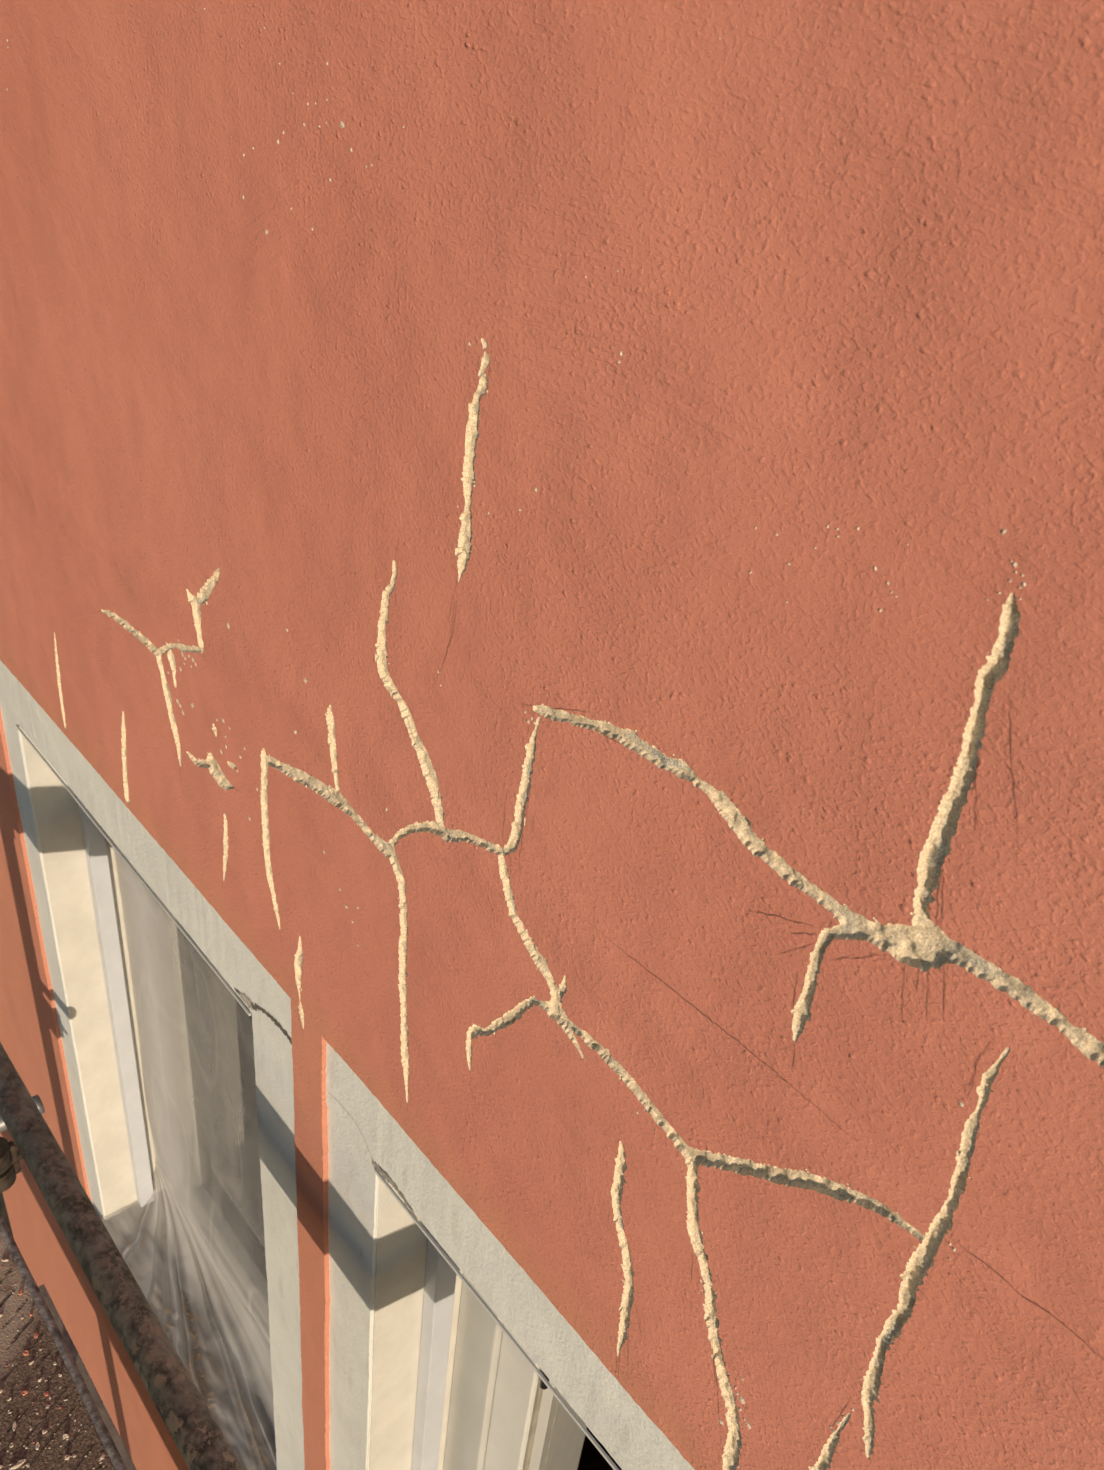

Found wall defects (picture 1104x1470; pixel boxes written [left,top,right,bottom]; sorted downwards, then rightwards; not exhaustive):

crack [95,338,1104,1470]